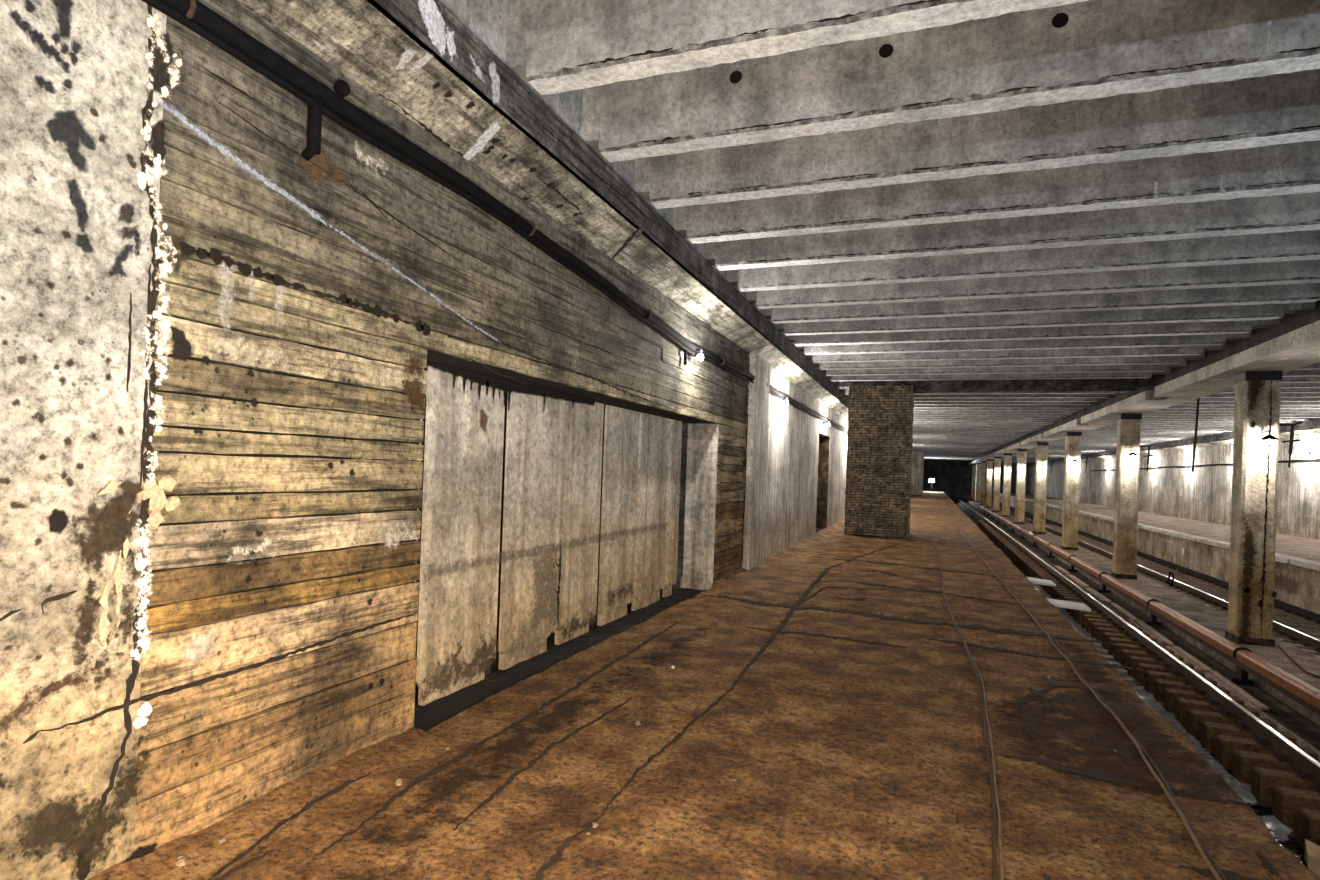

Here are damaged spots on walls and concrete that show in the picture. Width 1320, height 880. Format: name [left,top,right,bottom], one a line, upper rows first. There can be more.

water stain [53,0,73,39]
water stain [46,110,96,253]
water stain [110,203,142,277]
crack [313,621,680,856]
crack [208,773,371,880]